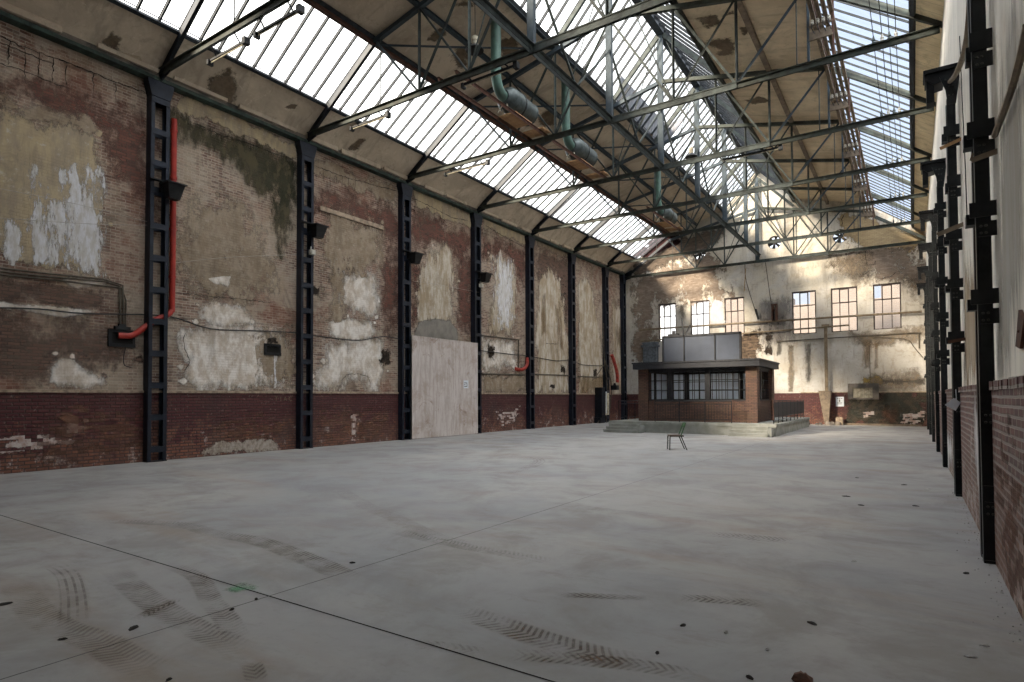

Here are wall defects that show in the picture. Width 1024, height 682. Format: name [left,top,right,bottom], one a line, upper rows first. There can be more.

crack [0,36,147,98]
damp [170,107,297,260]
peeling [0,77,159,389]
peeling [169,186,296,391]
peeling [313,159,398,392]
flaking render [411,190,735,394]
damp [850,326,924,346]
spalling [0,434,72,454]
spalling [197,438,278,456]
spalling [496,406,521,426]
spalling [863,409,926,424]